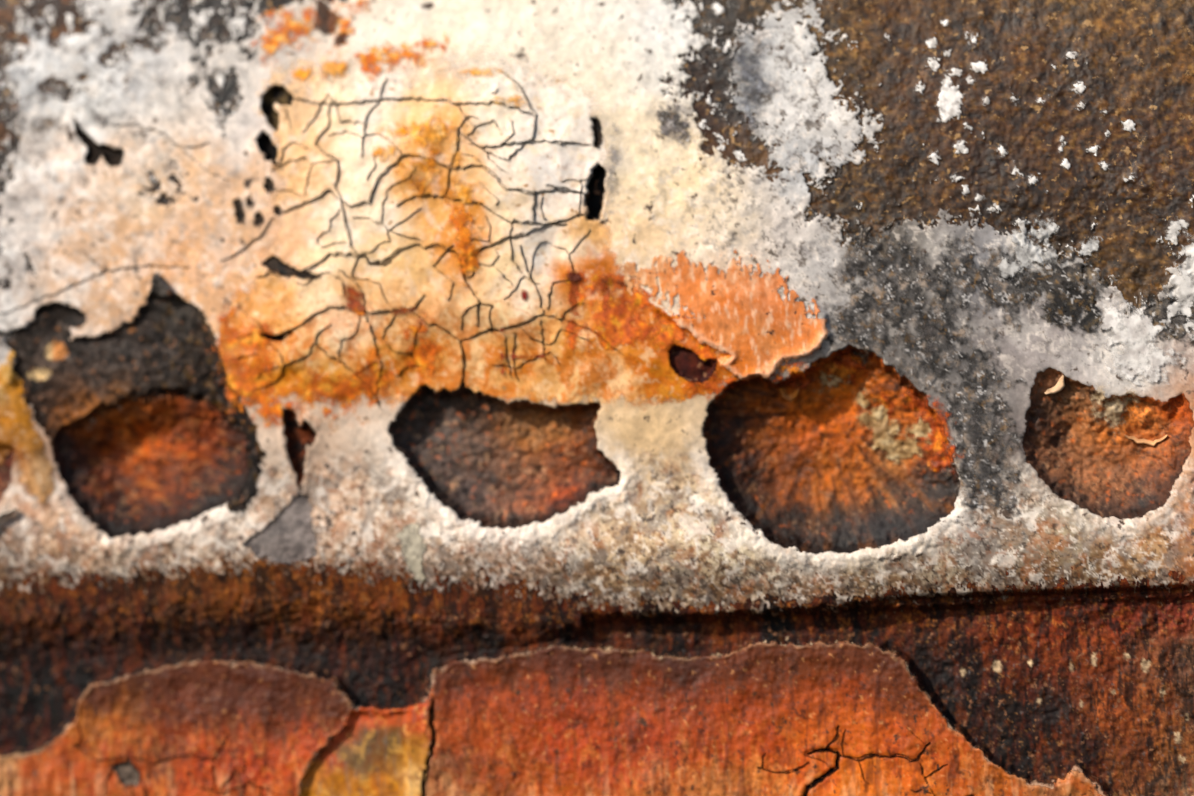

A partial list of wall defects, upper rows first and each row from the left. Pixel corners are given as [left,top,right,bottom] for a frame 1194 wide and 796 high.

water stain [736,35,771,128]
crack [221,71,624,410]
peeling [0,272,266,513]
peeling [623,249,828,381]
water stain [819,220,1194,537]
peeling [1045,375,1065,394]
crack [73,722,344,796]
crack [421,699,435,796]
peeling [0,640,1102,796]
crack [756,727,944,796]